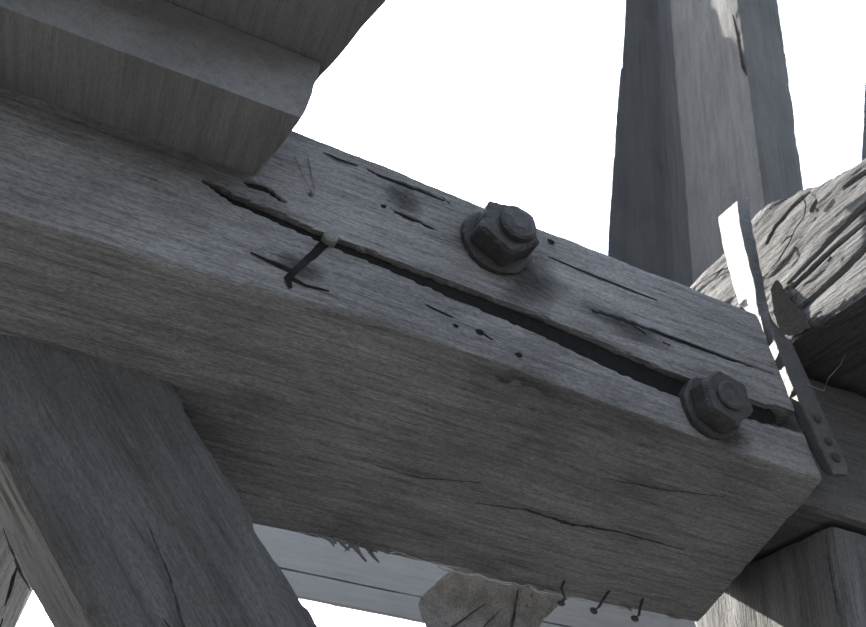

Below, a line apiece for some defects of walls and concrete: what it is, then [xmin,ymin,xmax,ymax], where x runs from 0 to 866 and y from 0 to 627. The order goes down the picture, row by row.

crack [732,14,747,76]
crack [323,152,449,203]
crack [768,192,810,269]
crack [213,183,686,397]
crack [592,310,754,368]
crack [746,404,776,425]
crack [376,465,685,550]